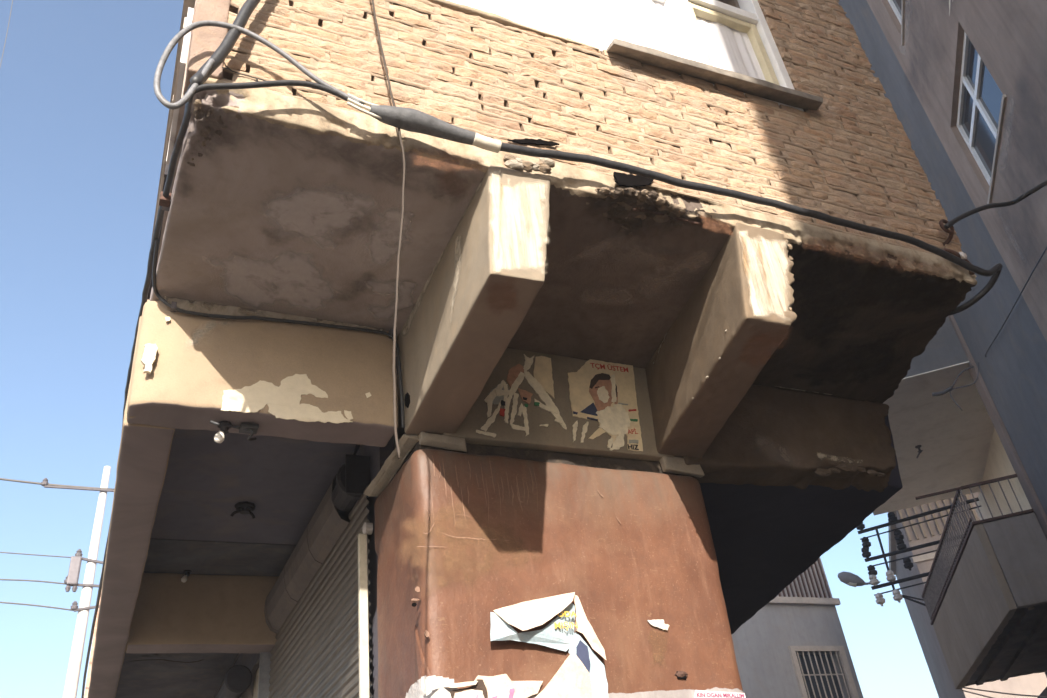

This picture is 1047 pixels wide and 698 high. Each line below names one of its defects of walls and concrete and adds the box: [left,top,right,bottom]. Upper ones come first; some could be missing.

damp [266,190,374,247]
damp [368,210,412,264]
spalling [586,171,707,235]
damp [211,251,334,310]
damp [367,236,460,335]
peeling [141,344,158,374]
peeling [221,374,353,424]